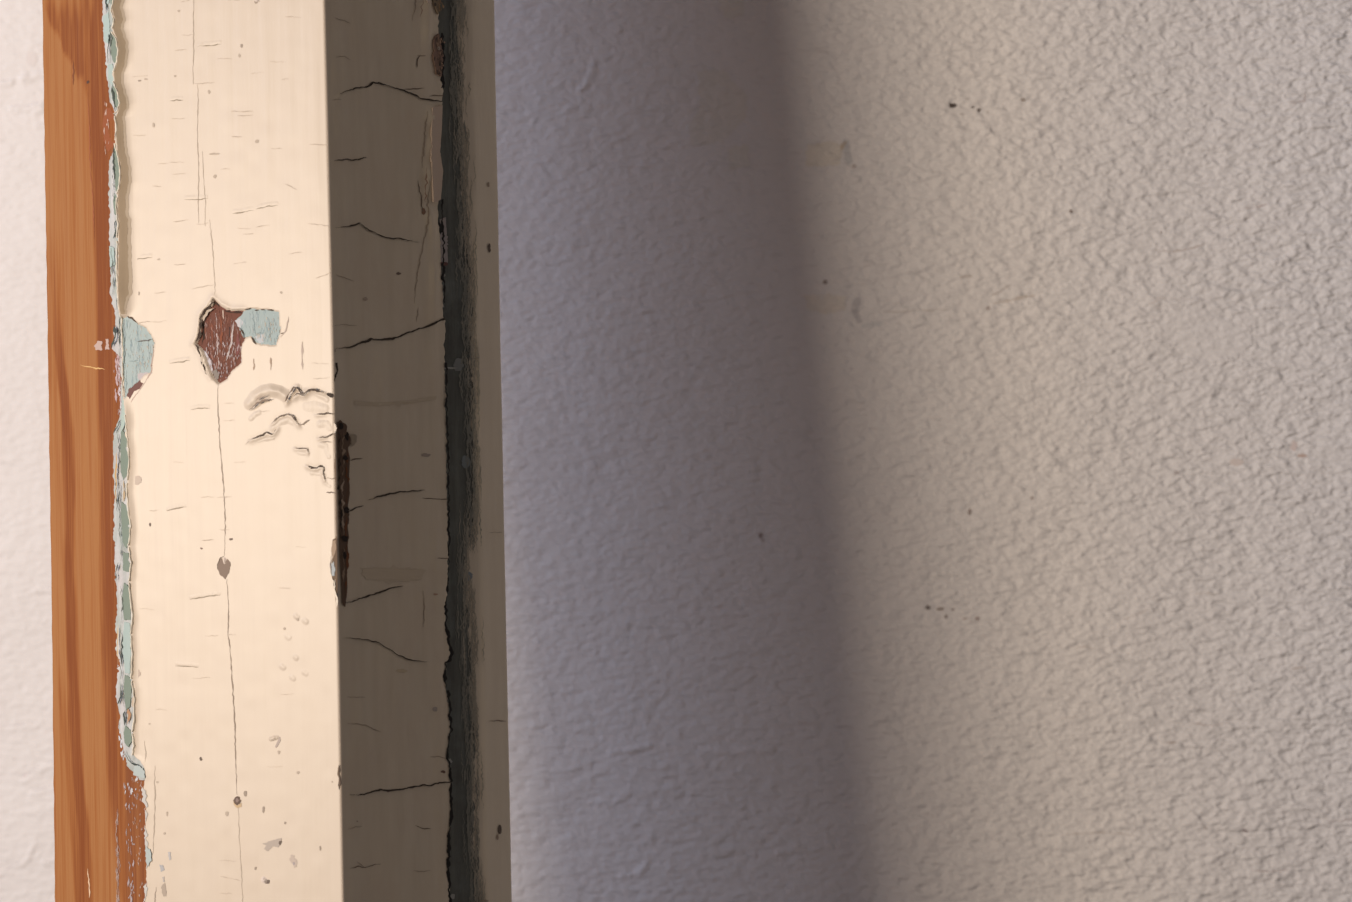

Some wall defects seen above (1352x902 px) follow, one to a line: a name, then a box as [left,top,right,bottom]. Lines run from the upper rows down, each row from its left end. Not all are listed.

peeling [110,0,121,194]
peeling [116,241,155,397]
peeling [197,300,245,383]
peeling [124,415,136,755]
crack [105,0,454,902]
spalling [331,420,351,607]